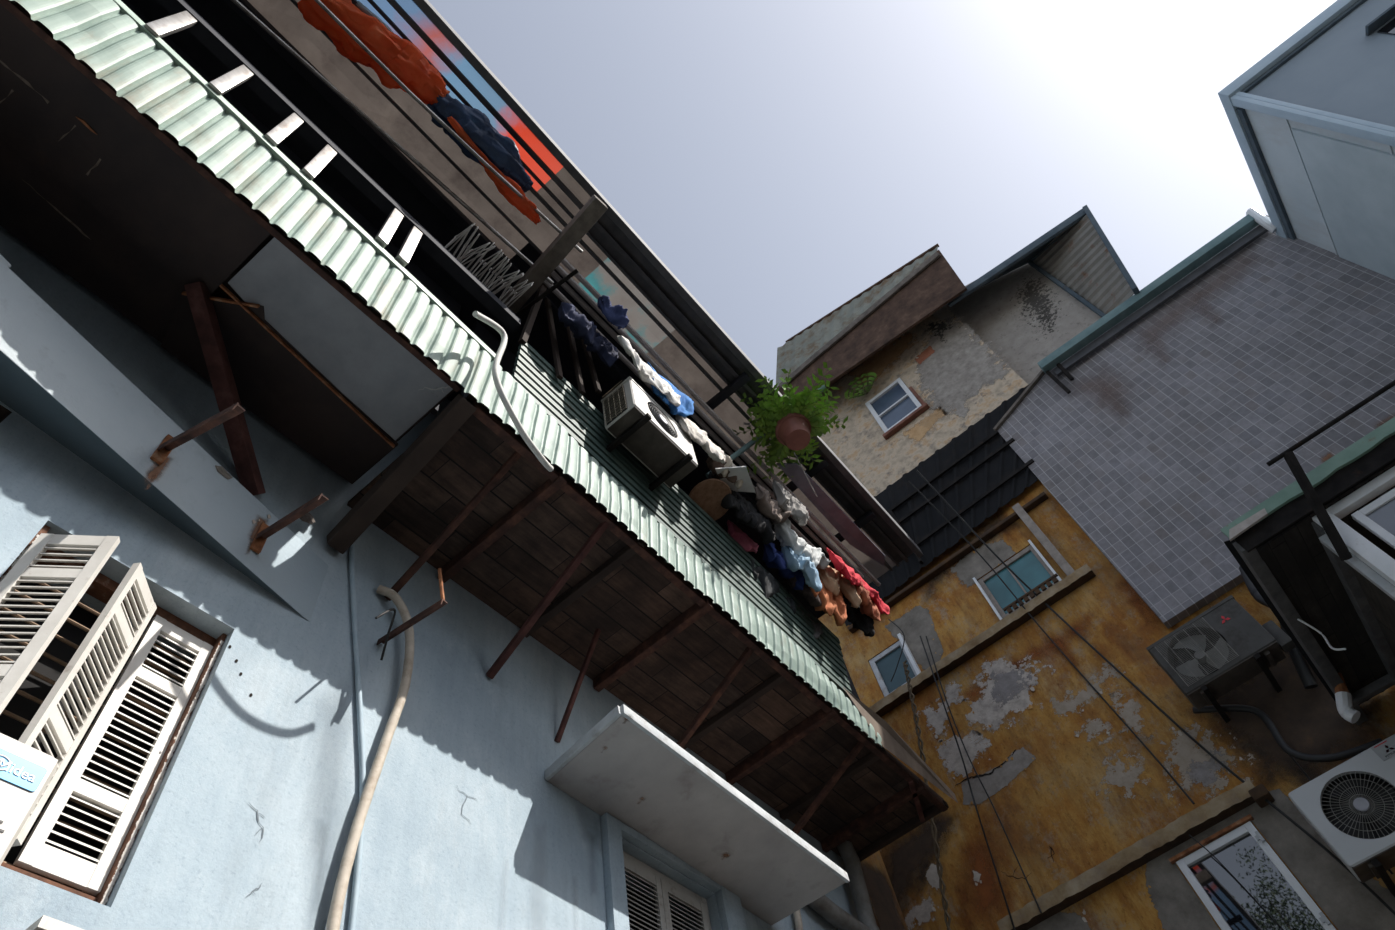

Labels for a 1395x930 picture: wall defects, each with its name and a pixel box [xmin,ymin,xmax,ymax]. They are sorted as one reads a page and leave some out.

leakage [1010,269,1067,341]
flaking render [848,305,1011,442]
rust [147,457,170,481]
peeling [916,655,1261,807]
peeling [905,864,940,930]